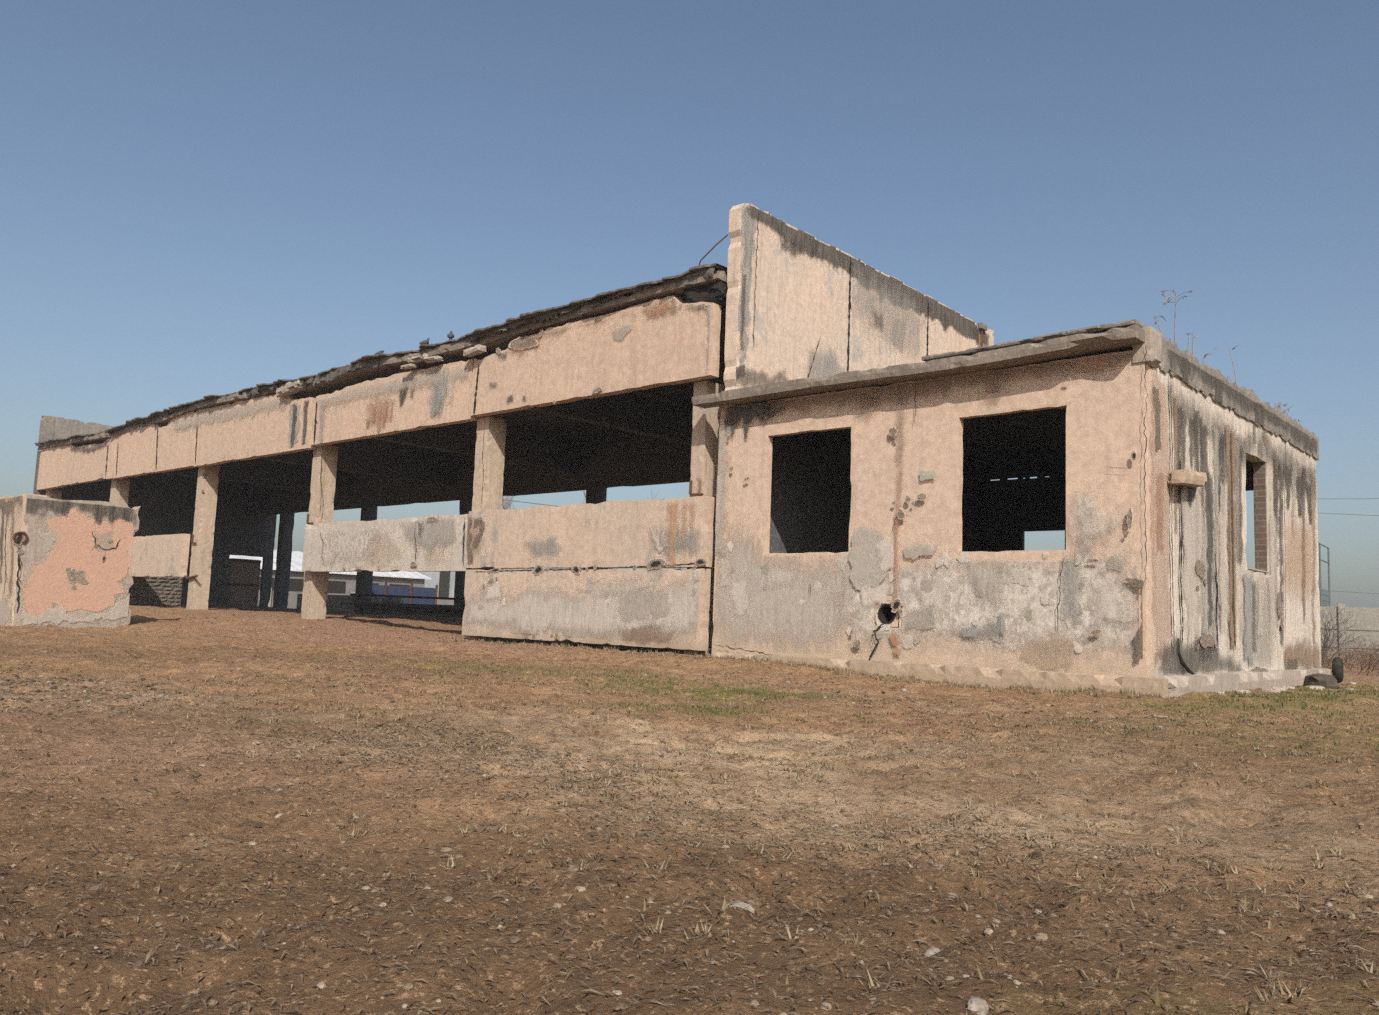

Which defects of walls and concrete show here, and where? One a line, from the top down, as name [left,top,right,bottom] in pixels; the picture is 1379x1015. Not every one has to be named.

leakage [736,203,985,378]
peeling [0,508,134,625]
peeling [464,429,1143,662]
leakage [1163,350,1320,674]